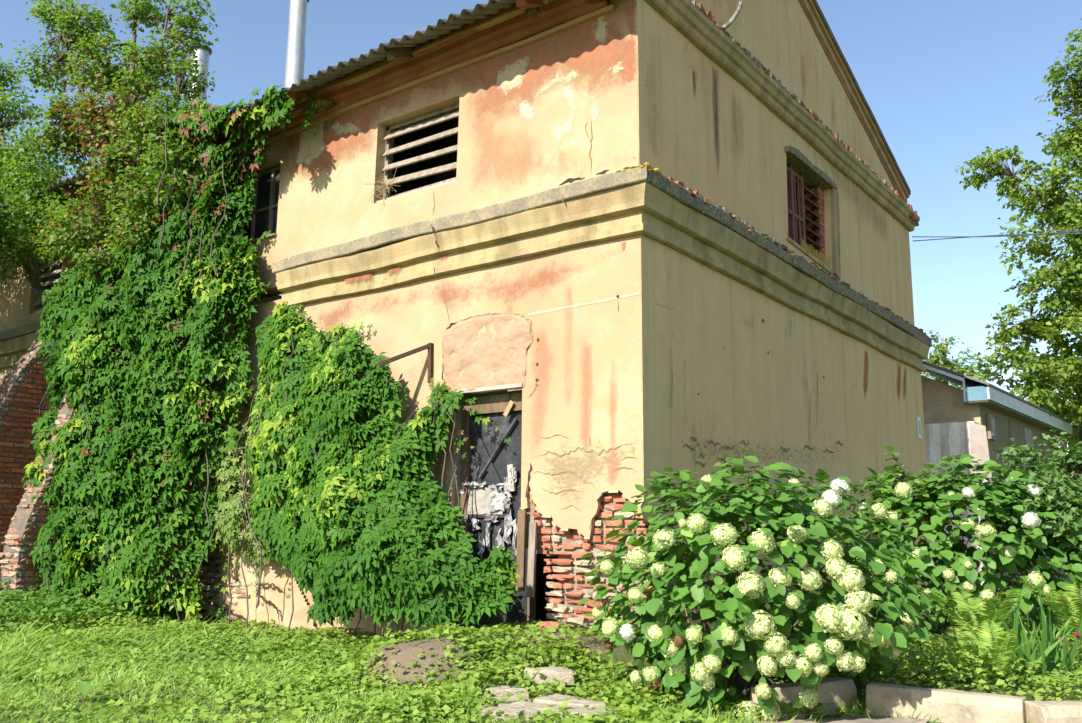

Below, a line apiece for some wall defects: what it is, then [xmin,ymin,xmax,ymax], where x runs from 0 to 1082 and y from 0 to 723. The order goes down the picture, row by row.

peeling [286,7,634,174]
corrosion [897,368,906,396]
crack [528,434,638,510]
spalling [525,483,661,637]